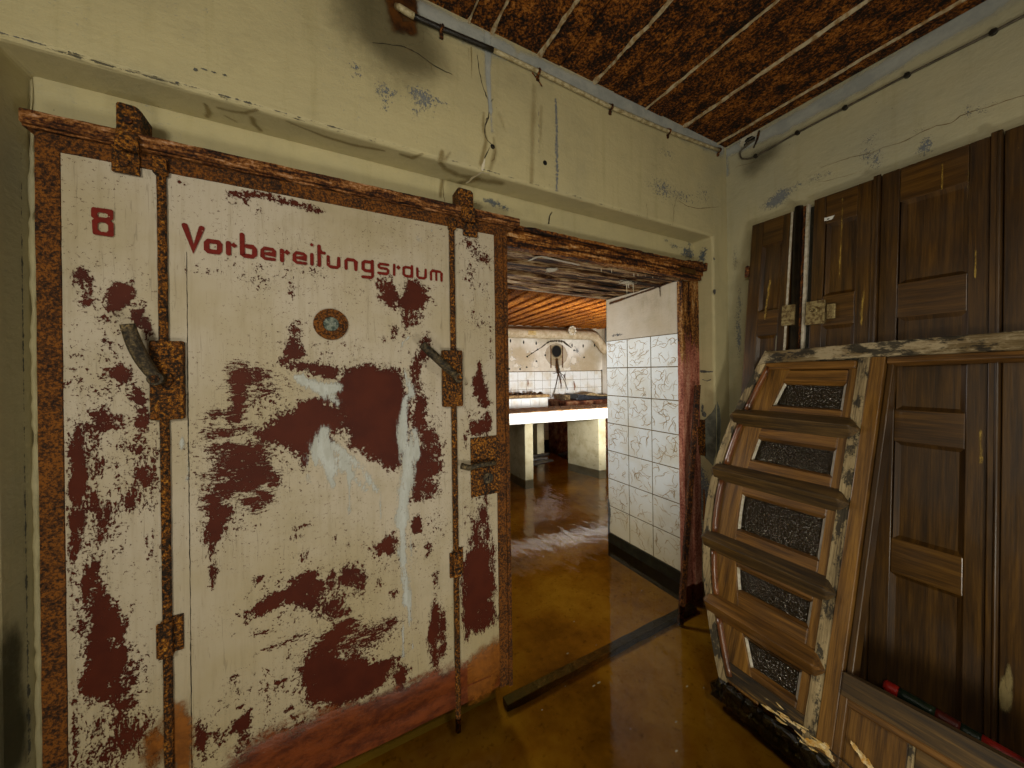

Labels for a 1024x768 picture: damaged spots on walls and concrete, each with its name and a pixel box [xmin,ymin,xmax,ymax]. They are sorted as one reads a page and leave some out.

peeling [349,56,448,121]
crack [821,95,1024,182]
peeling [224,189,323,214]
peeling [185,256,335,304]
peeling [456,237,494,448]
peeling [63,252,164,768]
peeling [176,273,499,768]
rust [143,702,193,768]
rust [229,641,500,768]